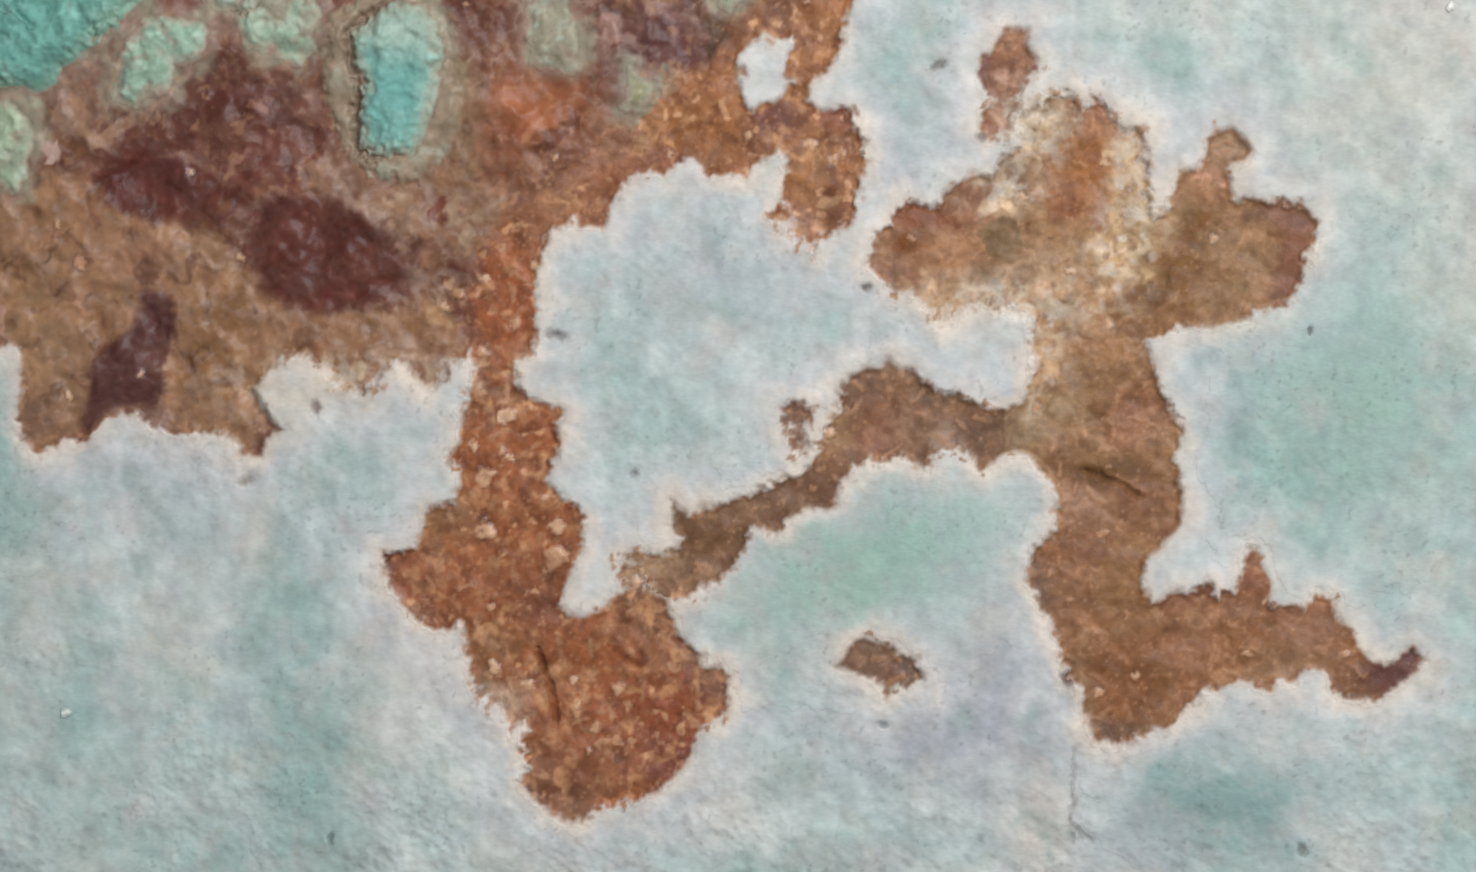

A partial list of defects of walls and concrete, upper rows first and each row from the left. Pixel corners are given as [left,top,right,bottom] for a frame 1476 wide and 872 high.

spalling [925,57,950,76]
spalling [0,0,730,490]
spalling [858,282,875,296]
corrosion [376,0,1430,829]
spalling [872,719,893,731]